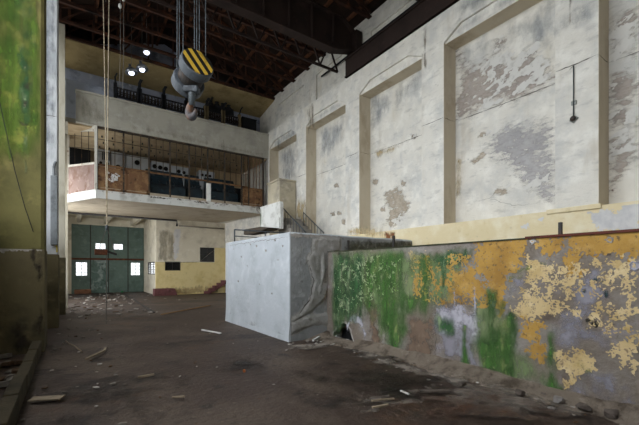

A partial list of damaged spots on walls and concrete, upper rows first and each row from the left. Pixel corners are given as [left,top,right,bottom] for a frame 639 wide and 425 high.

peeling [455,35,555,117]
peeling [609,72,639,182]
peeling [380,181,413,229]
leakage [434,292,480,365]
leakage [487,289,504,314]
leakage [490,313,516,371]
peeling [408,204,639,410]